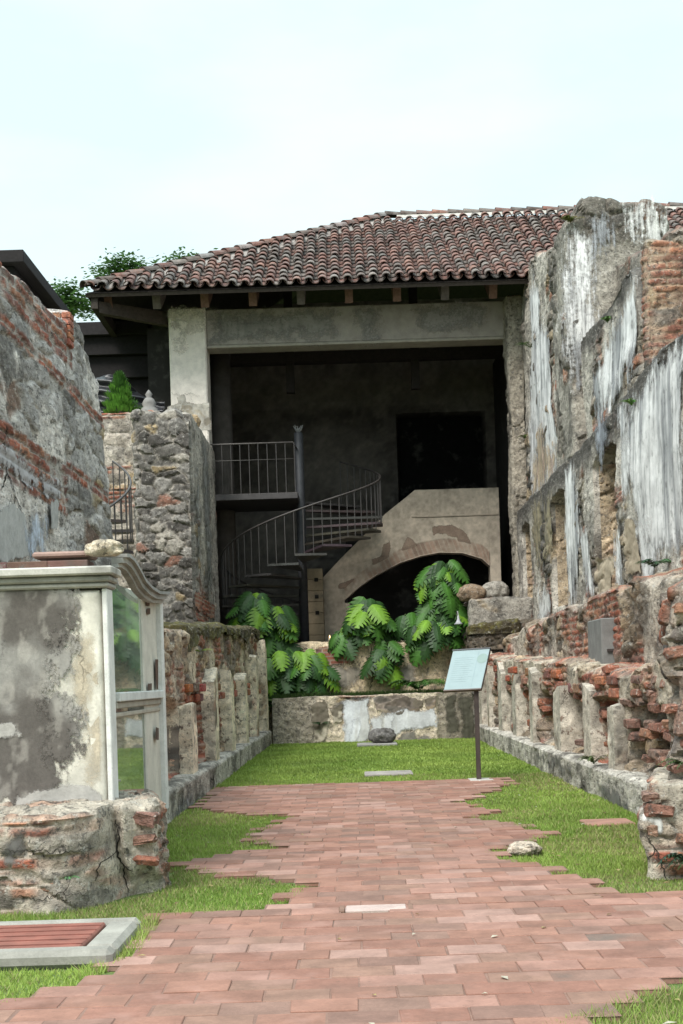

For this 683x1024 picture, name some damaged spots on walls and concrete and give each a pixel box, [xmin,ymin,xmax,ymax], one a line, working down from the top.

leakage [528,214,615,604]
leakage [593,282,683,576]
leakage [614,530,622,585]
leakage [0,583,101,806]
crack [0,820,132,901]